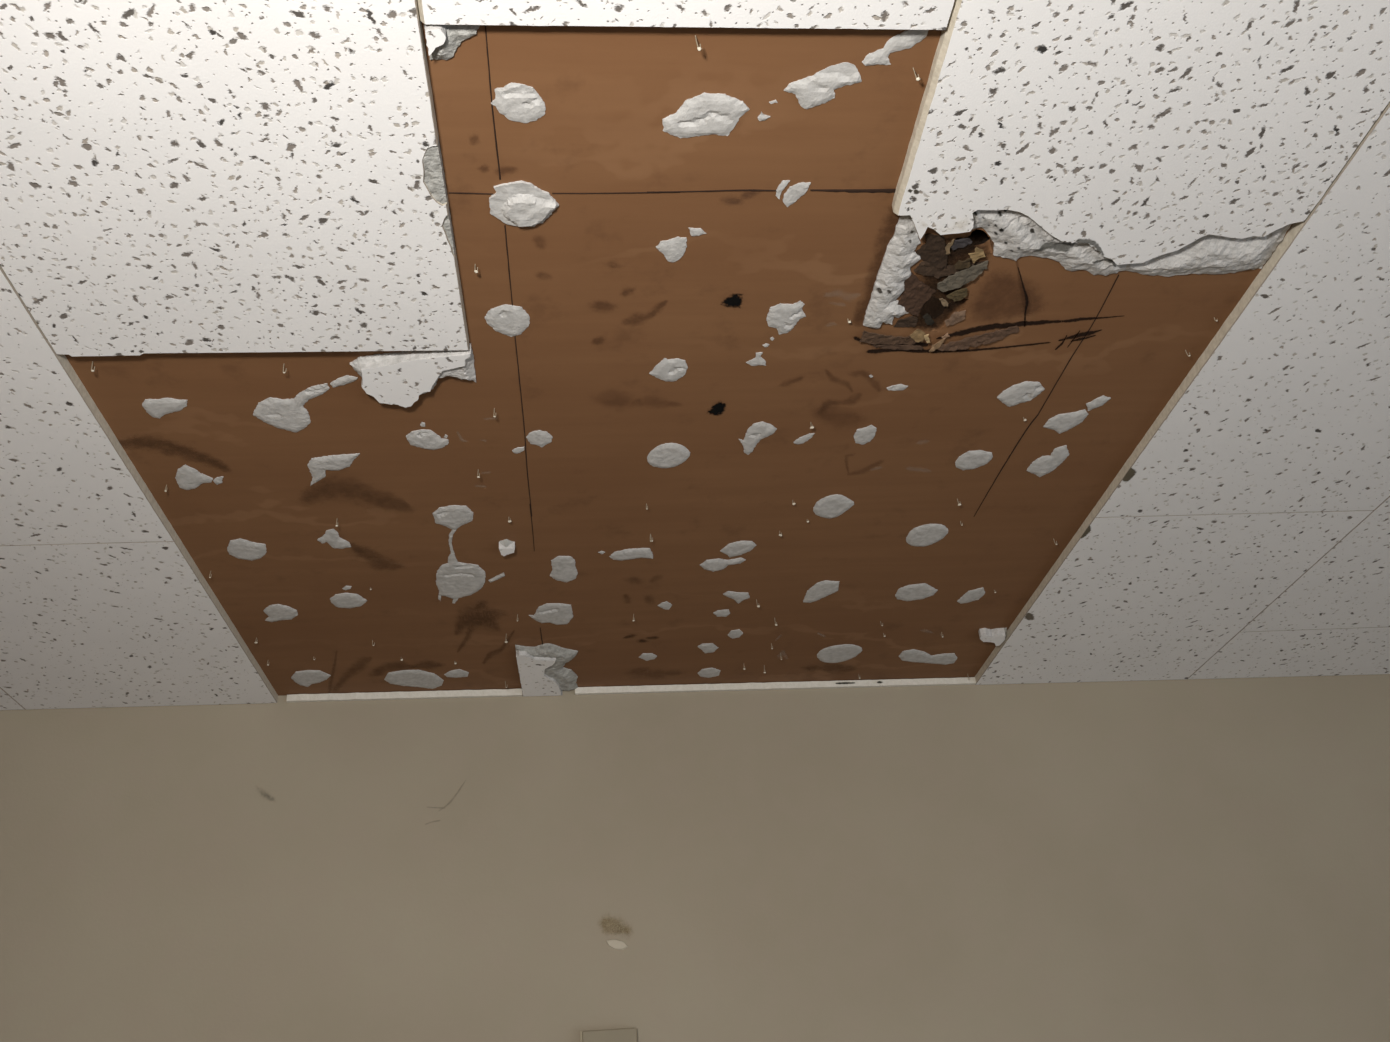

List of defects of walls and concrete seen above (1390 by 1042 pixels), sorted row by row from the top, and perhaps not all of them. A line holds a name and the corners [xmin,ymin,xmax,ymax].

spalling [423,136,455,255]
peeling [776,180,790,199]
peeling [689,228,706,236]
peeling [859,233,1019,352]
peeling [330,375,358,387]
crack [854,268,1121,516]
peeling [1086,395,1111,411]